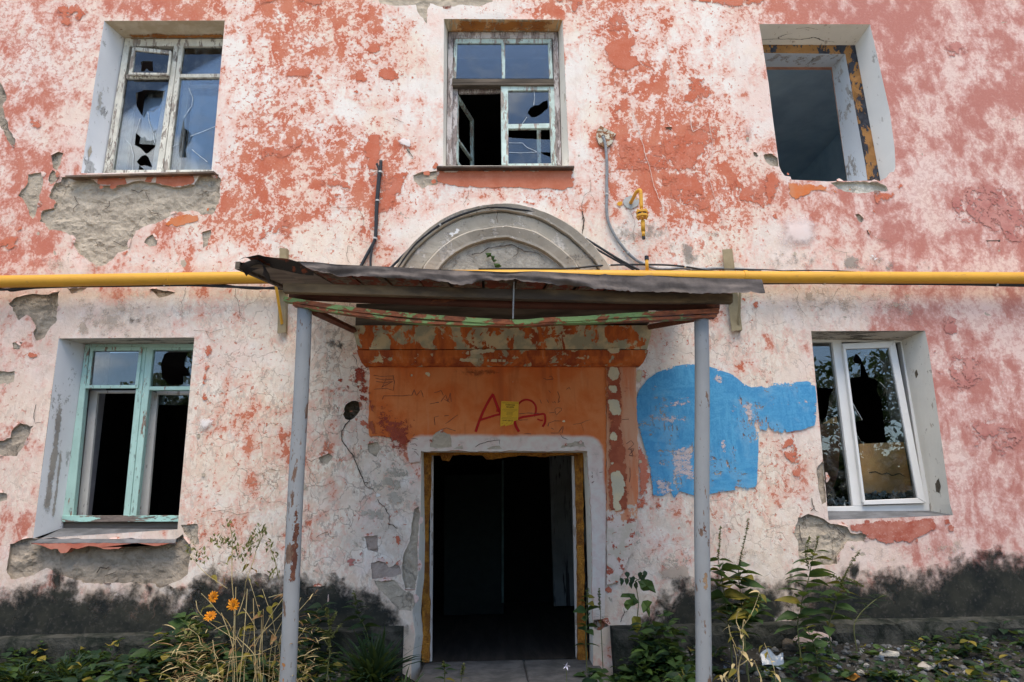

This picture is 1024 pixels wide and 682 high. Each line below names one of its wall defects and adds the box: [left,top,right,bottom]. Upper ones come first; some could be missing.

flaking render [18,150,221,266]
flaking render [724,150,903,234]
flaking render [9,288,86,358]
peeling [460,349,506,362]
flaking render [0,422,33,458]
crack [341,420,396,528]
damp [52,568,63,586]
flaking render [6,514,209,588]
flaking render [347,507,423,611]
flaking render [792,514,954,565]